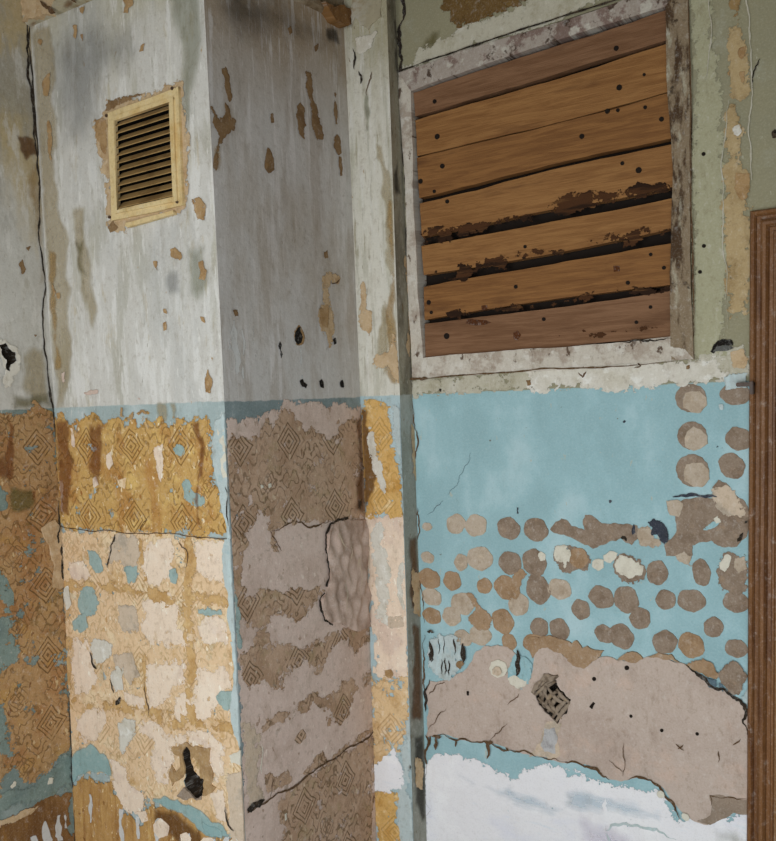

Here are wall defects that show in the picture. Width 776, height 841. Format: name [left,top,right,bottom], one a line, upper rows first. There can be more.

flaking render [0,339,21,388]
peeling [538,544,571,568]
peeling [592,551,644,579]
peeling [637,519,669,548]
flaking render [0,399,424,841]
flaking render [426,630,748,825]
crack [247,732,373,813]